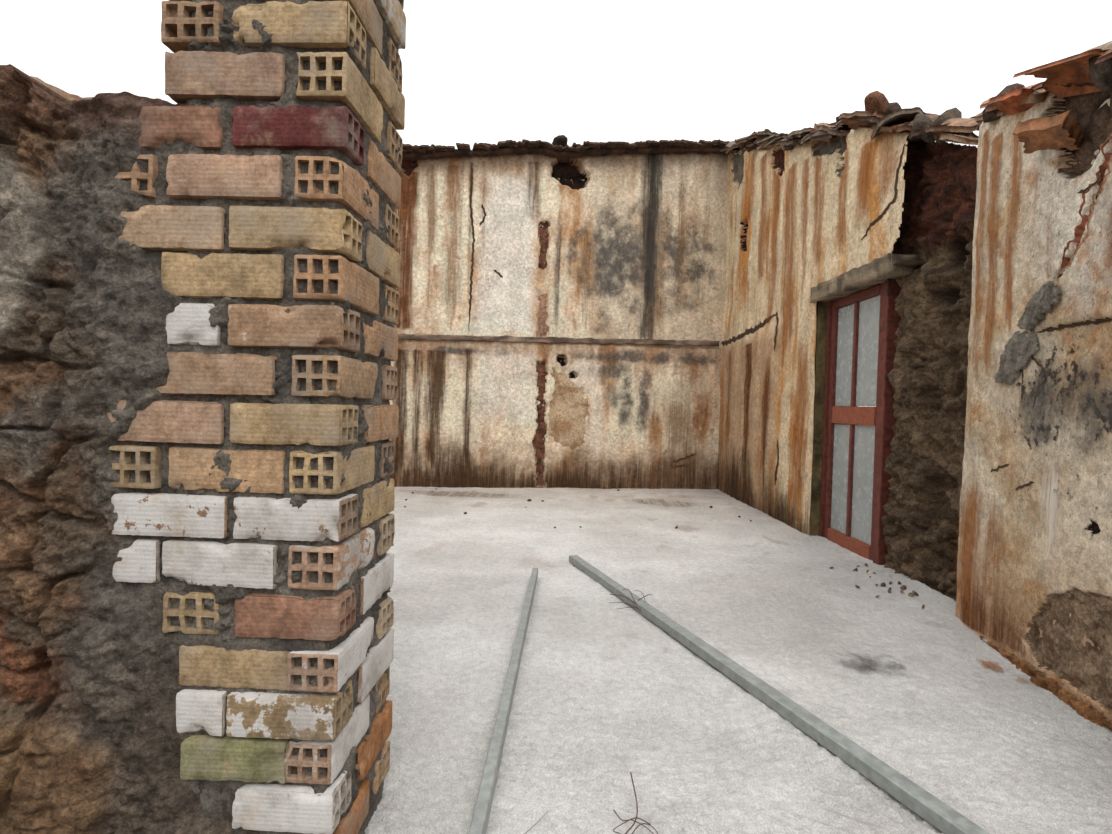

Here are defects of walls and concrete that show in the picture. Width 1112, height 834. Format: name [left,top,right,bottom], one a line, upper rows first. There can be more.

corrosion [394,165,458,329]
spalling [551,160,590,190]
leakage [556,153,712,339]
corrosion [748,153,821,352]
corrosion [839,132,892,219]
crack [861,144,906,240]
corrosion [975,131,1021,365]
spalling [1018,82,1112,179]
crack [1057,134,1112,281]
spalling [720,106,1003,601]
crack [1021,317,1112,407]
peeling [1024,587,1112,714]